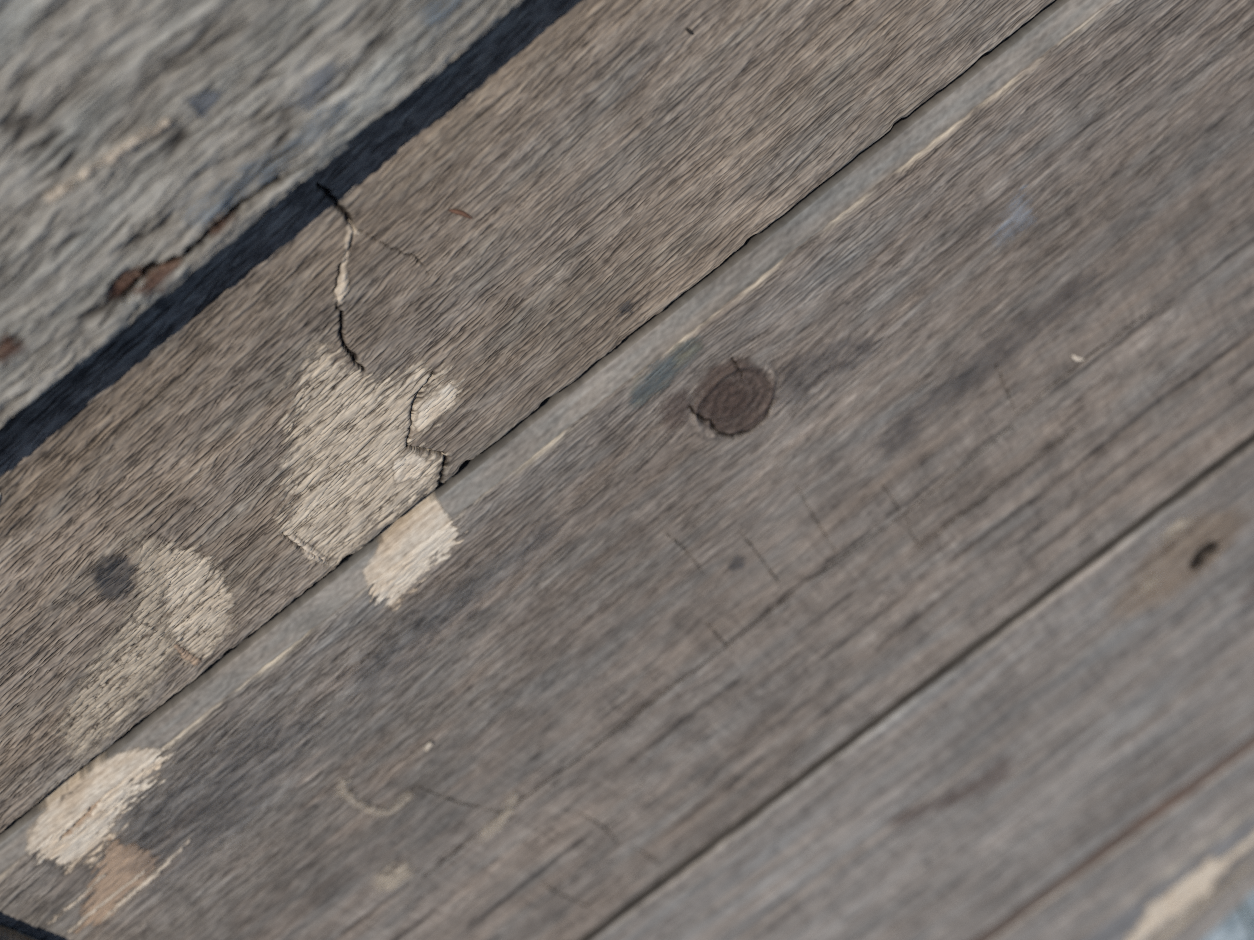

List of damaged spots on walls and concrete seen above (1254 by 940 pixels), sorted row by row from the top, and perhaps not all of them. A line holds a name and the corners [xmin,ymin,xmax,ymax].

crack [316,183,421,370]
peeling [273,342,468,614]
peeling [26,532,235,934]
peeling [1126,831,1254,940]